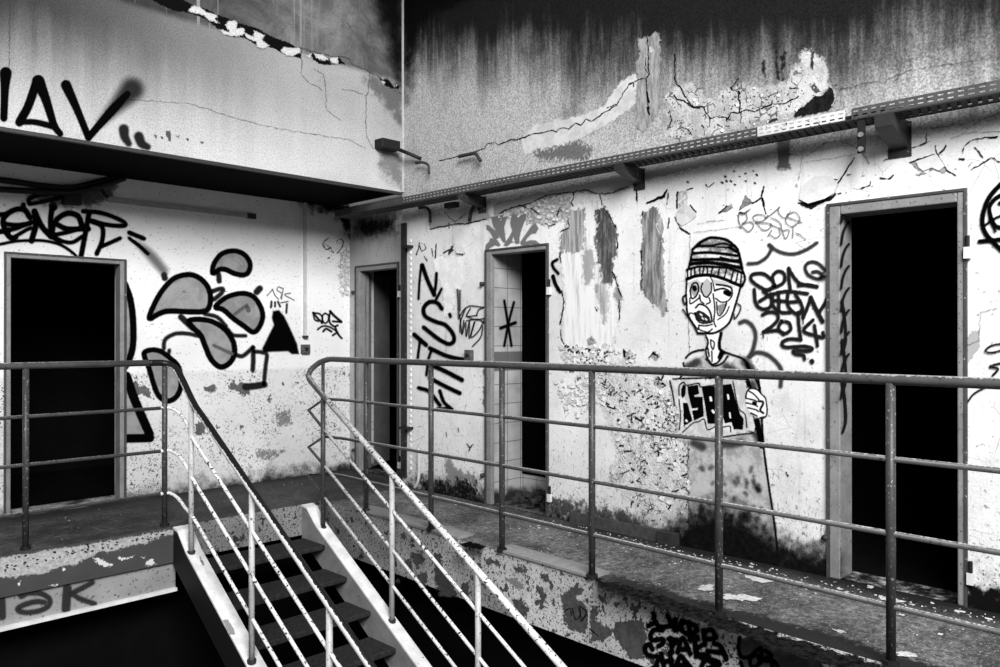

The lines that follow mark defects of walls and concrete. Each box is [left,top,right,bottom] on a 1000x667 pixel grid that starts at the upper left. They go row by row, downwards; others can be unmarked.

spalling [153,0,345,65]
water stain [762,49,787,81]
crack [439,36,799,161]
peeling [661,48,836,143]
peeling [645,140,799,180]
crack [791,141,894,189]
crack [912,113,1000,170]
peeling [430,176,697,527]
peeling [0,530,173,586]
peeling [396,550,470,597]
spalling [460,541,501,569]